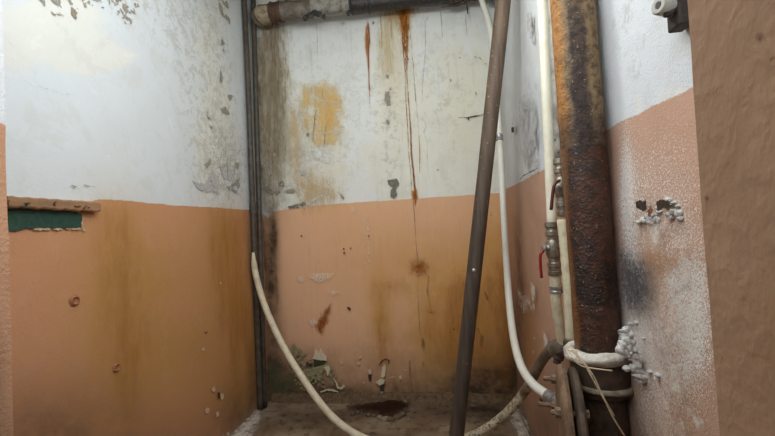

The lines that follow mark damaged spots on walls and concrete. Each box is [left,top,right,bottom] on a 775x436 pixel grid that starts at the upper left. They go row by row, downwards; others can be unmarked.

peeling [40,0,139,24]
water stain [258,23,343,206]
corrosion [387,9,420,221]
peeling [193,160,240,195]
peeling [387,179,399,198]
spalling [635,196,684,243]
water stain [618,249,652,315]
corrosion [316,308,329,333]
peeling [267,343,345,398]